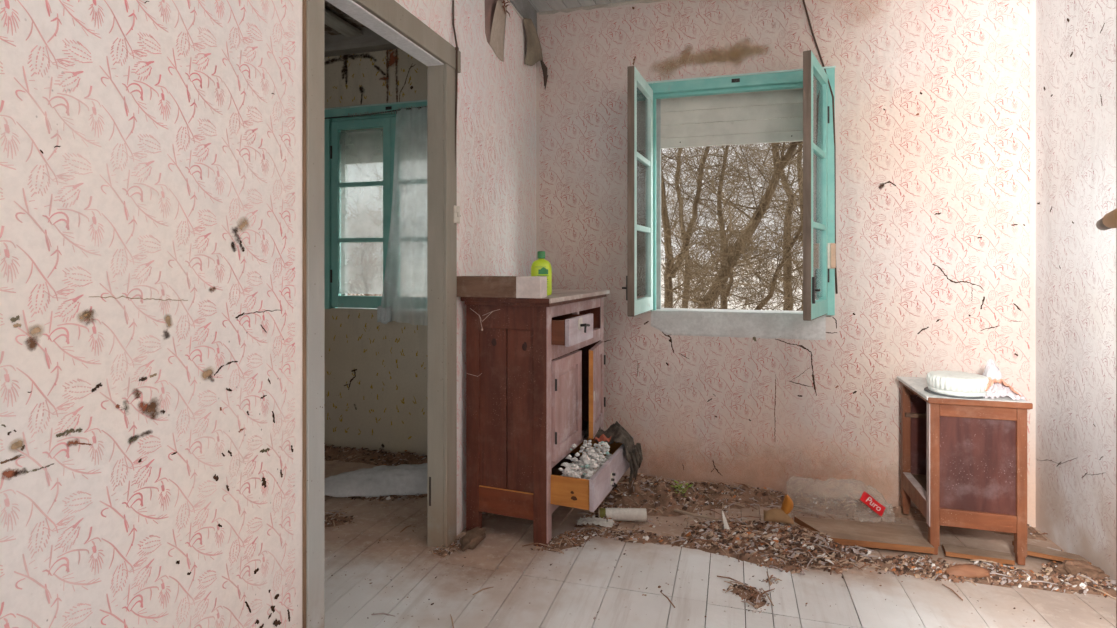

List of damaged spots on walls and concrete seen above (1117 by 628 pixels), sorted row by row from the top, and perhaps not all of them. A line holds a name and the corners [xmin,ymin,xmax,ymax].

crack [933,264,982,301]
crack [753,317,837,437]